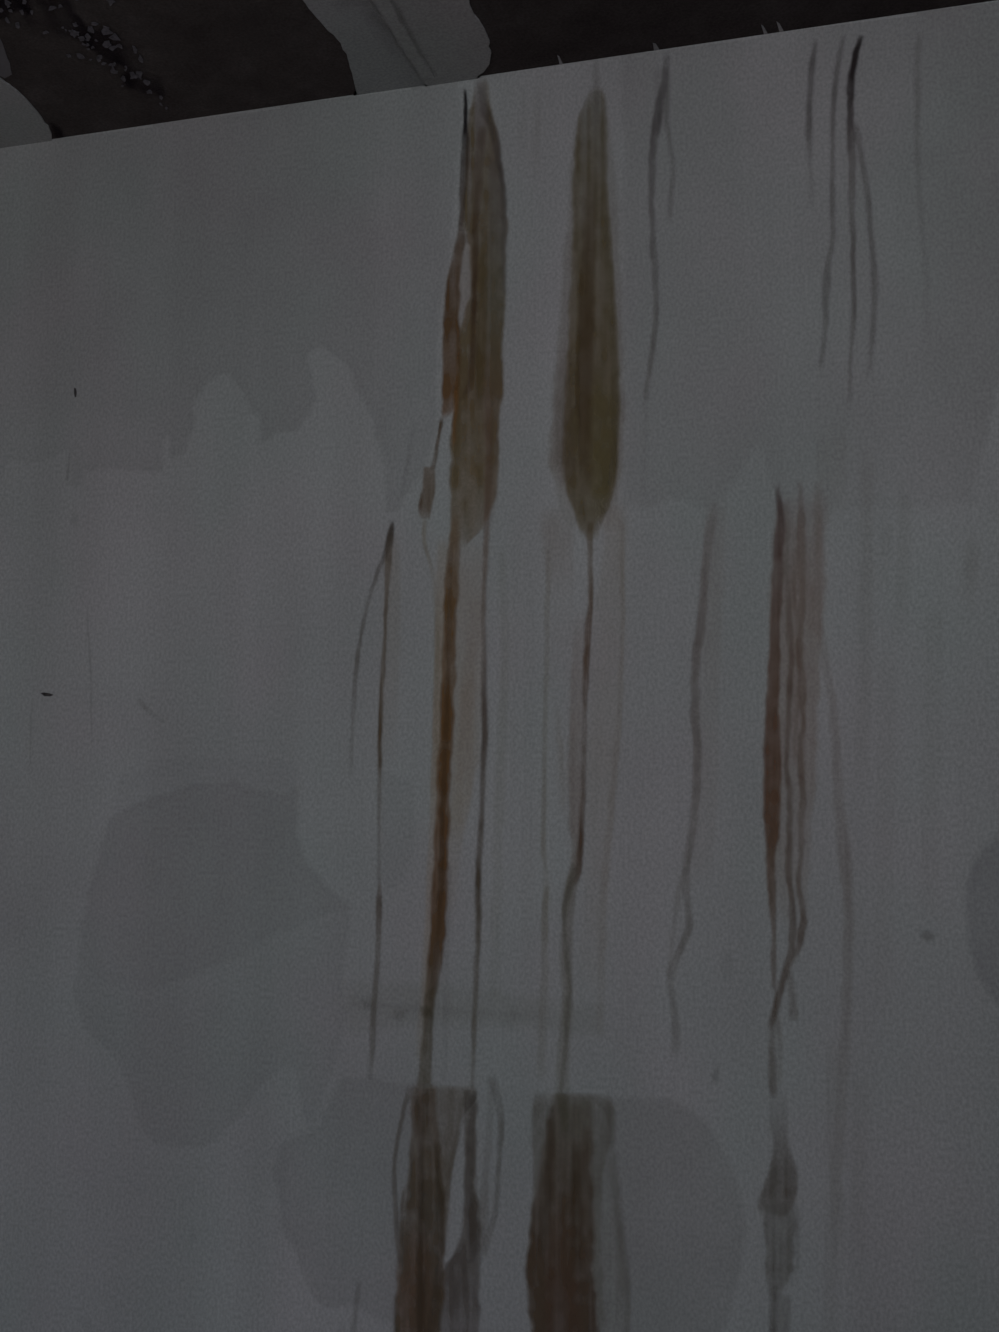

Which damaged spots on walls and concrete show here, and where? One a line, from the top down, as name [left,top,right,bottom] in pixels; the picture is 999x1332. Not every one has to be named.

damp [847,39,862,139]
rust [436,92,504,517]
rust [565,107,619,536]
rust [426,544,457,1027]
rust [764,592,792,904]
rust [395,1078,480,1332]
rust [526,1126,596,1332]